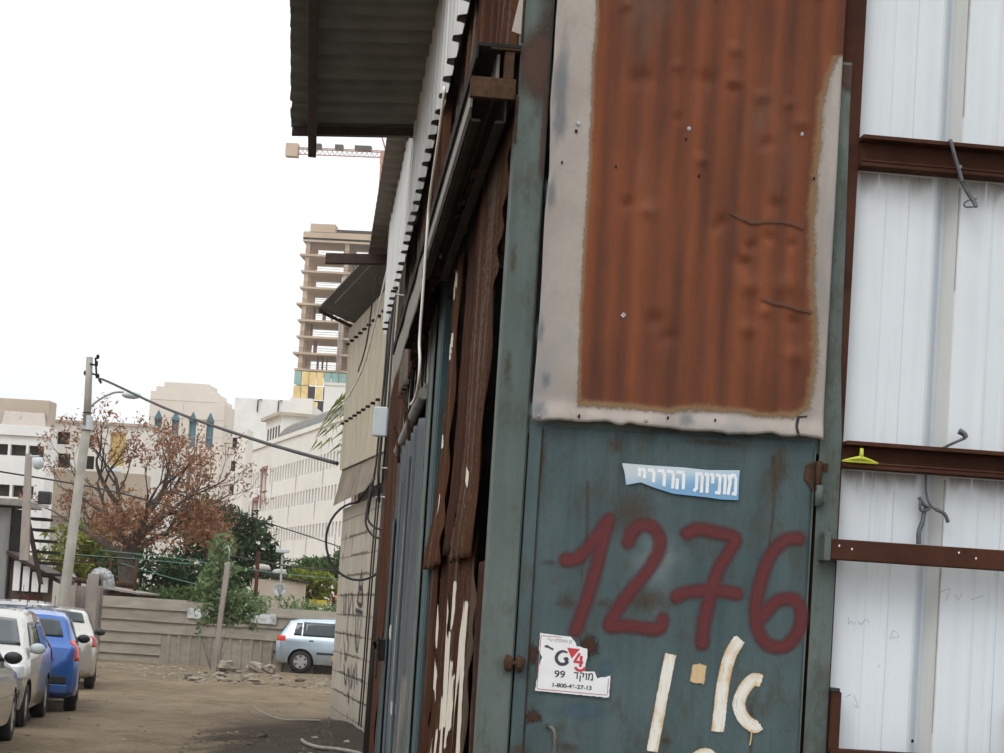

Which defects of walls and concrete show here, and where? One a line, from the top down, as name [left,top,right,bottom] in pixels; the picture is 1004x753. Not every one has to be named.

rust [577,0,852,419]